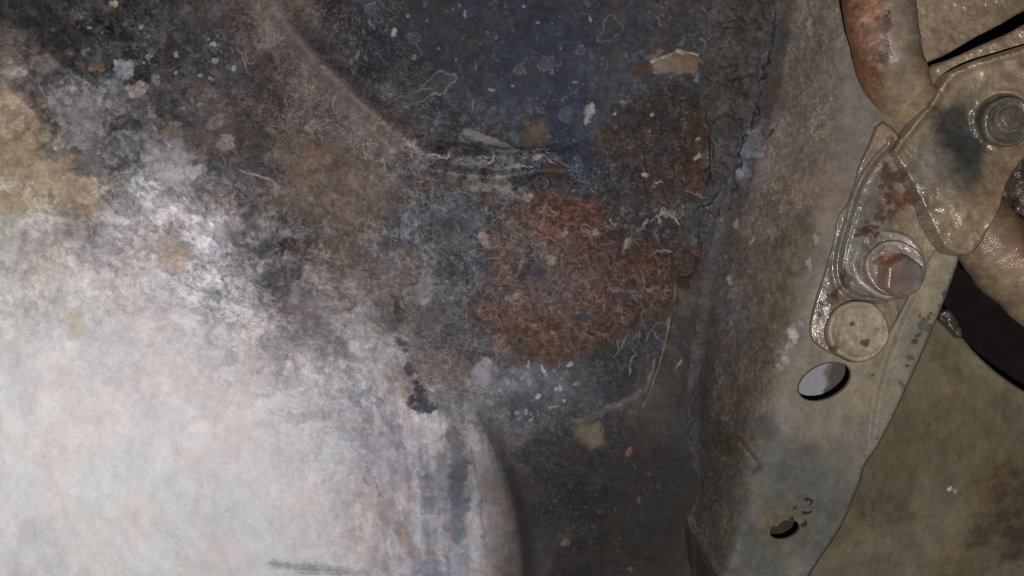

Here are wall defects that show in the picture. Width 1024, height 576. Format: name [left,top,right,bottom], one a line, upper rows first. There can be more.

peeling [650,49,699,83]
crack [697,27,775,210]
corrosion [469,194,705,364]